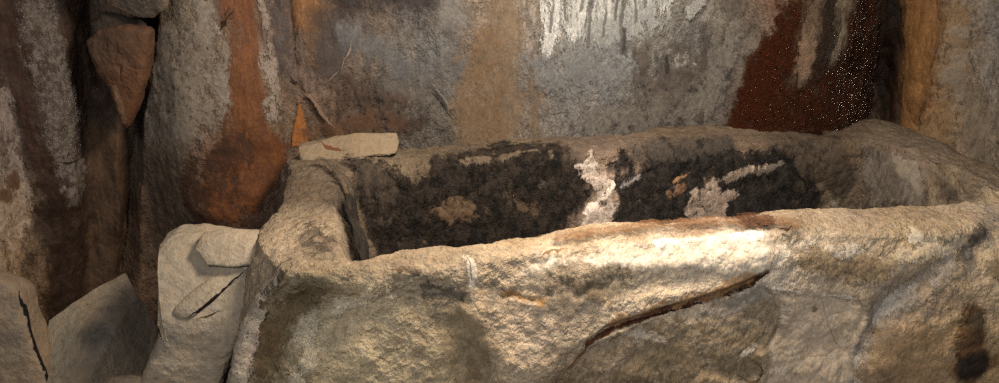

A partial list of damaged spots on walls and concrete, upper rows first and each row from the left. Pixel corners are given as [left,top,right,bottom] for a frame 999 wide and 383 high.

damp [513,0,956,225]
crack [188,270,246,319]
crack [556,236,775,383]
damp [522,226,964,283]